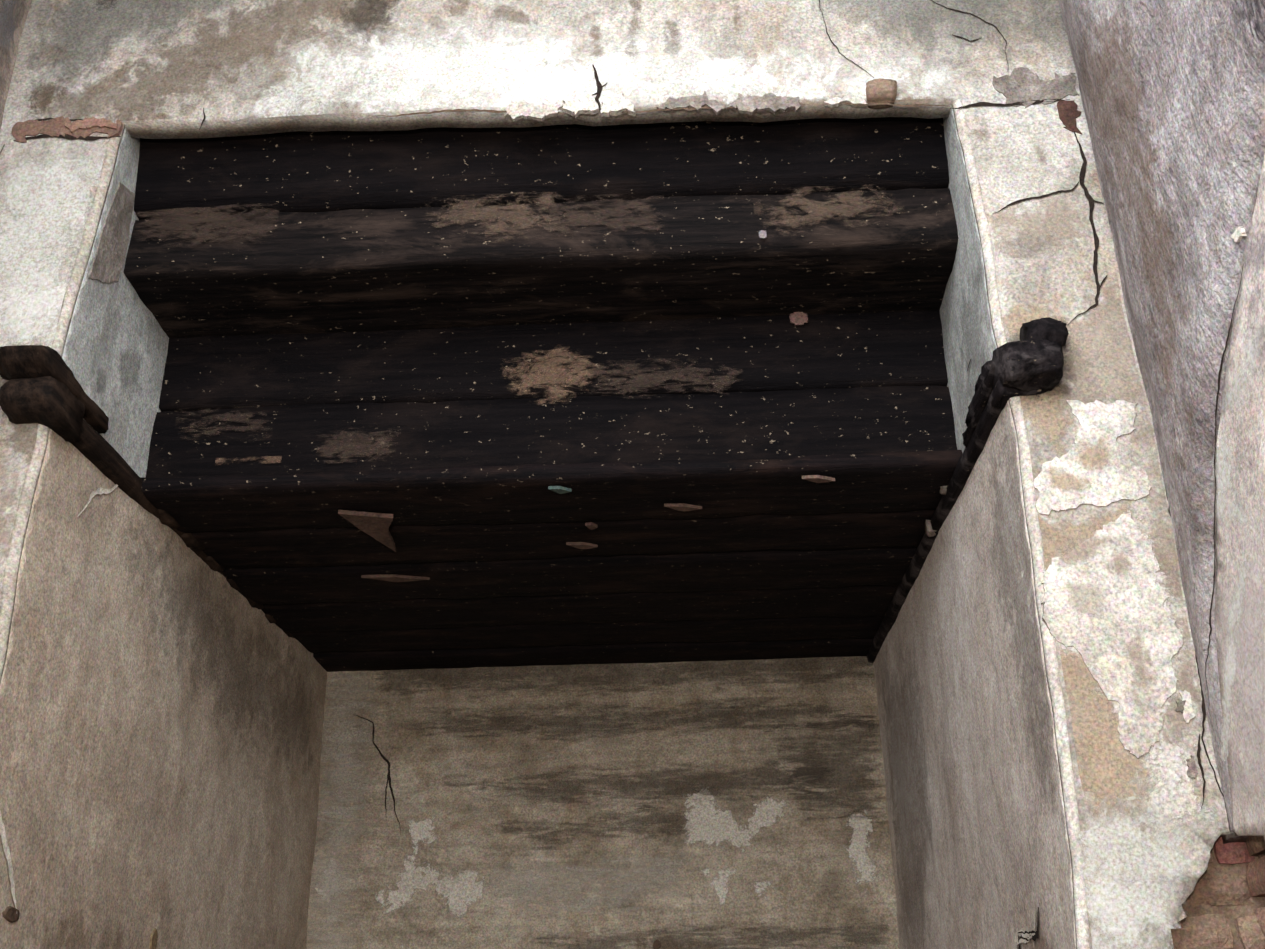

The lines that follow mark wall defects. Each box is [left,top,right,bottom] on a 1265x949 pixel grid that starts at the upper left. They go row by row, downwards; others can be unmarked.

water stain [240,0,952,117]
crack [592,64,608,113]
crack [819,0,874,78]
crack [931,0,1009,66]
crack [950,99,1107,326]
crack [1195,264,1244,831]
peeling [1033,400,1265,949]
crack [353,714,401,831]
peeling [375,816,492,918]
peeling [700,868,736,906]
peeling [682,787,787,852]